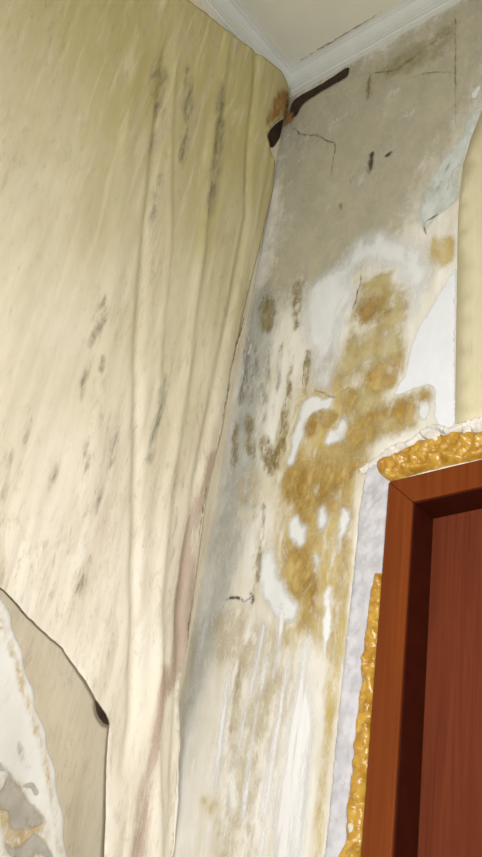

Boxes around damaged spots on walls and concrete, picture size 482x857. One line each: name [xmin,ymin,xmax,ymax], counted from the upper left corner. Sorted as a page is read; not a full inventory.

corrosion [267,91,293,125]
crack [368,9,456,124]
peeling [420,109,481,231]
damp [194,0,482,857]
damp [147,453,215,778]
peeling [0,765,52,857]